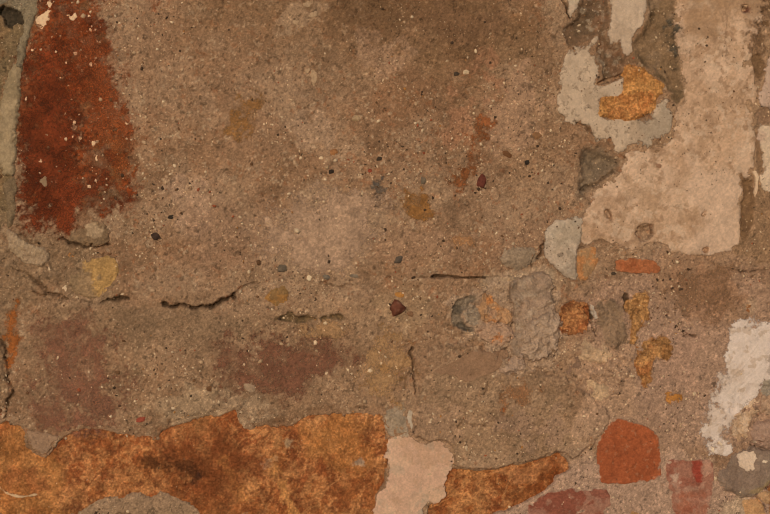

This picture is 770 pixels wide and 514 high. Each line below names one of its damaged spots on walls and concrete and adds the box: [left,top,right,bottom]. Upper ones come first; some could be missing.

corrosion [15,0,138,245]
peeling [543,0,770,280]
crack [415,272,502,280]
crack [160,281,261,311]
peeling [736,441,768,472]